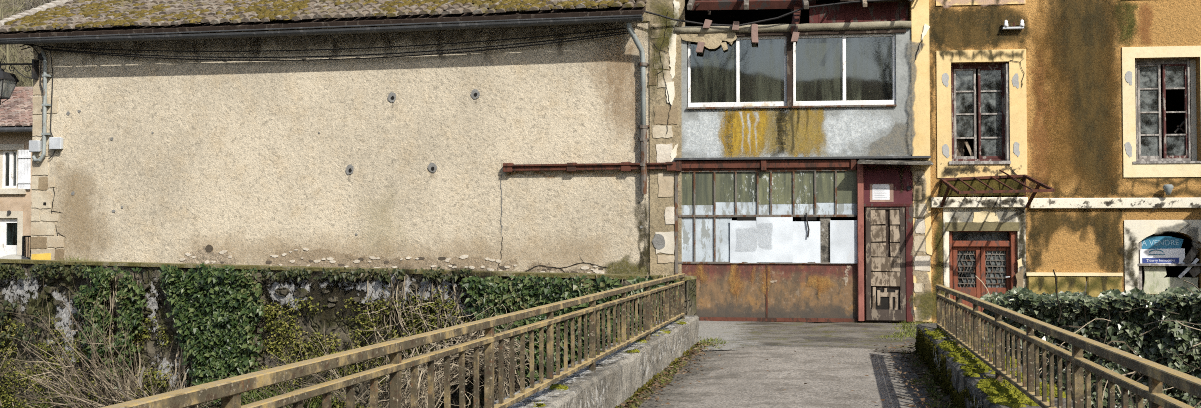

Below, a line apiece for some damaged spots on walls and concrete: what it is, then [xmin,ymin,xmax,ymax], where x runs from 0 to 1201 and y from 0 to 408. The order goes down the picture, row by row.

water stain [699,108,824,154]
water stain [900,0,1151,293]
peeling [1075,198,1200,211]
water stain [266,268,494,322]